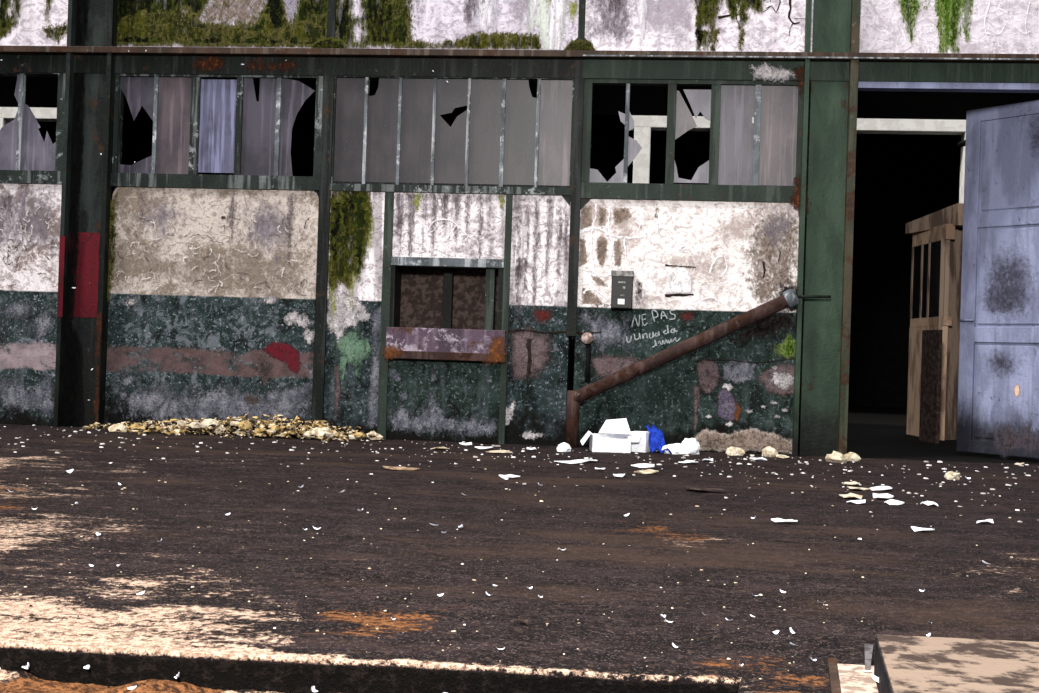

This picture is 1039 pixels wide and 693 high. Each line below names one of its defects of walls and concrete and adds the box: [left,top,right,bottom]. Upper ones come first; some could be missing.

damp [0,0,21,35]
damp [463,0,497,33]
damp [527,0,577,50]
damp [590,0,659,46]
damp [701,0,741,26]
crack [763,0,805,36]
damp [898,0,974,53]
peeling [0,206,58,346]
damp [329,195,369,290]
damp [745,210,799,304]
corrosion [483,335,507,364]
peeling [0,364,55,417]